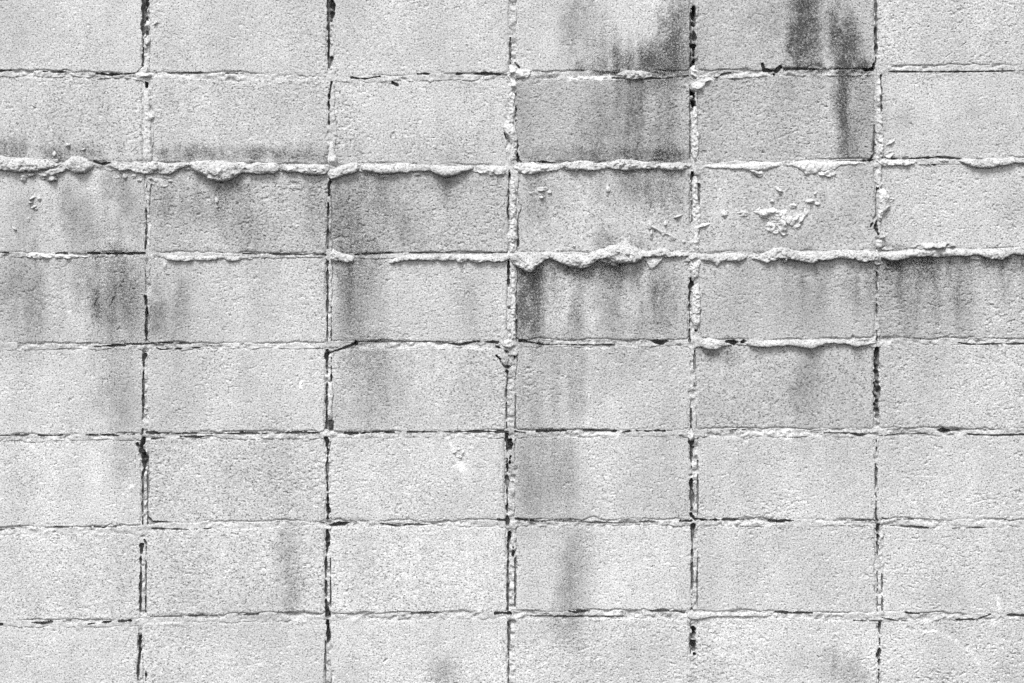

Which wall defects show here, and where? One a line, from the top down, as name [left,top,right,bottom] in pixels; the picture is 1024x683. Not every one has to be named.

leakage [567,7,687,81]
leakage [787,0,868,152]
leakage [516,271,543,340]